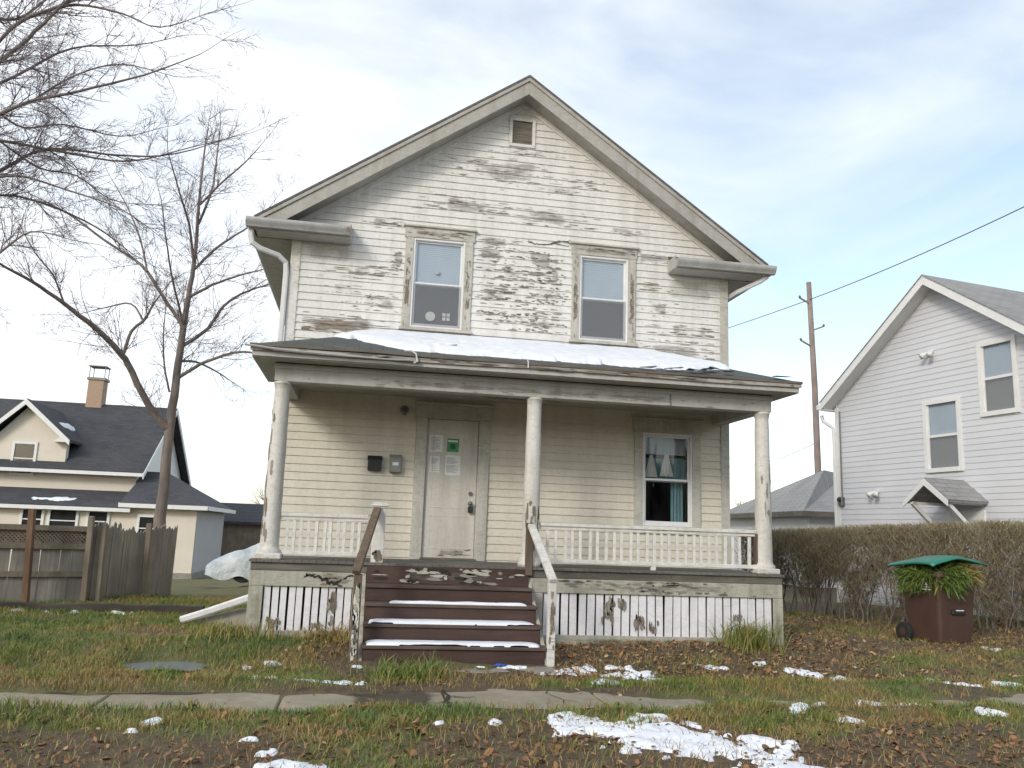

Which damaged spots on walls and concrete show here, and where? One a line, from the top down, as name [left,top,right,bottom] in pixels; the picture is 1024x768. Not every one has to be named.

peeling [430,147,607,196]
peeling [414,194,599,229]
peeling [302,218,668,344]
peeling [629,274,715,360]
crack [304,573,354,587]
peeling [309,573,361,662]
peeling [372,549,525,585]
peeling [547,580,734,650]